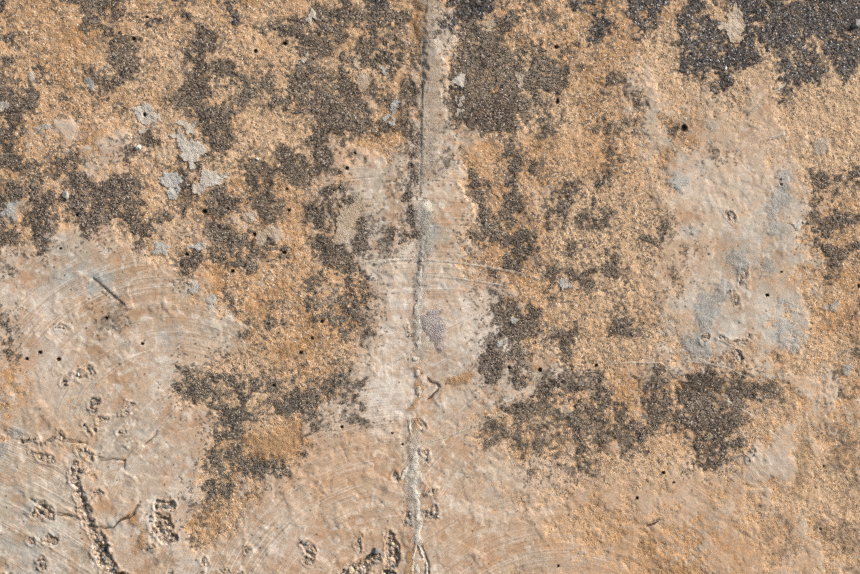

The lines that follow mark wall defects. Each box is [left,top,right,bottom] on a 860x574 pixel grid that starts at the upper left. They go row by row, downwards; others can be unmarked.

spalling [68,447,128,574]
spalling [340,531,400,574]